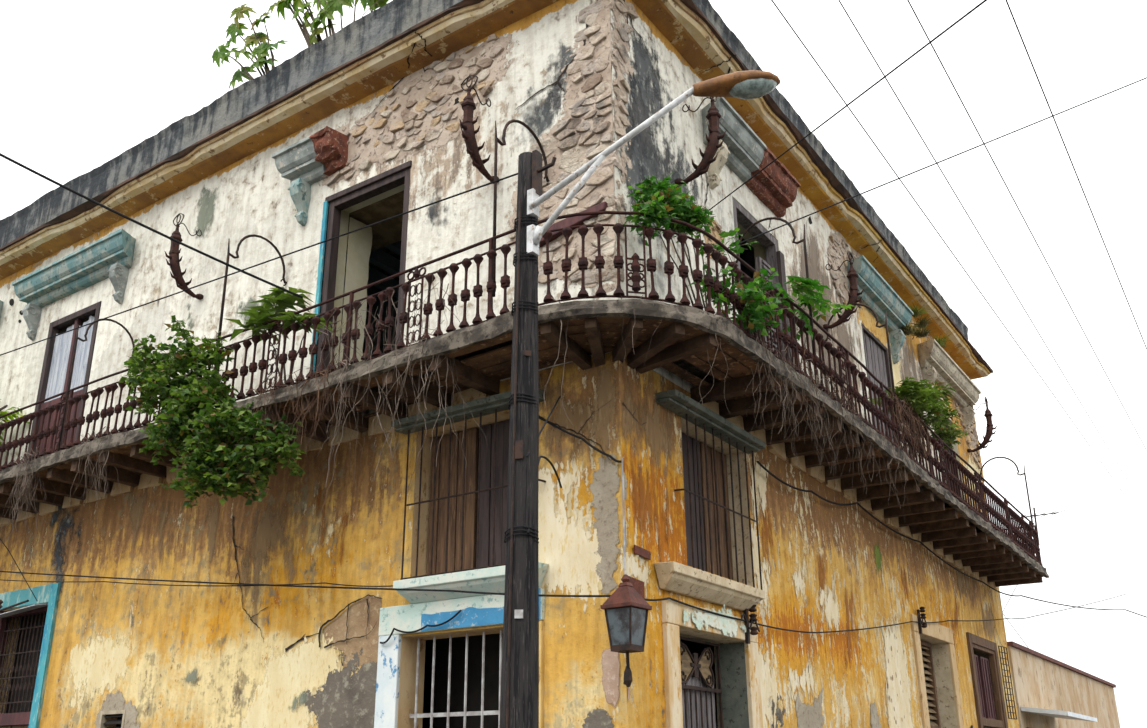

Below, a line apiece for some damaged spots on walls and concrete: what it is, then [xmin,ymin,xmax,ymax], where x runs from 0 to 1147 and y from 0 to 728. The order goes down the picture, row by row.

spalling [319,33,519,189]
spalling [529,0,639,300]
damp [628,38,673,126]
damp [620,134,699,244]
damp [51,505,81,593]
peeling [538,452,651,612]
corrosion [623,467,669,562]
peeling [750,460,771,614]
peeling [792,566,845,635]
peeling [230,596,382,728]
peeling [759,648,825,728]
peeling [870,615,915,728]